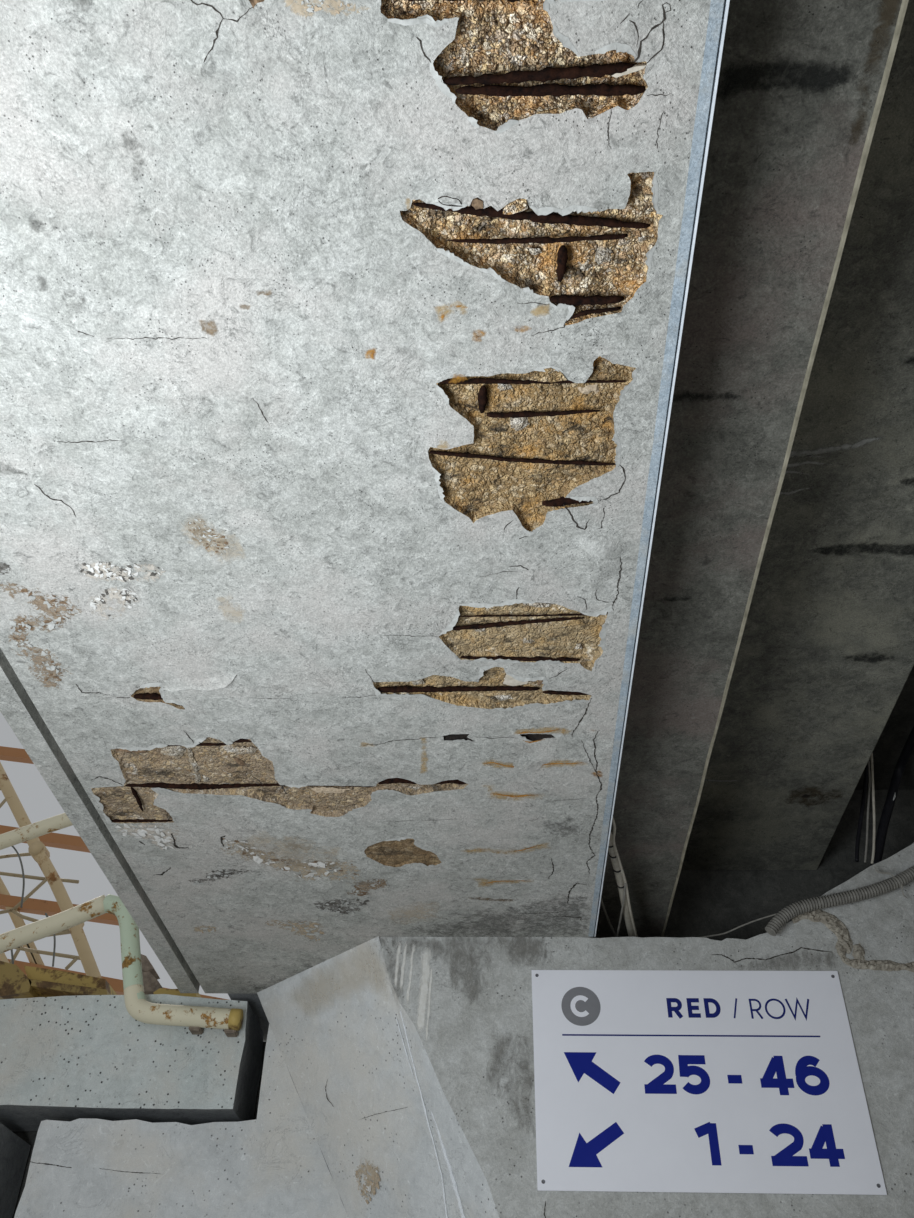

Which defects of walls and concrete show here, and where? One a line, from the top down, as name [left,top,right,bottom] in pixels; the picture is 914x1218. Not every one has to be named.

crack [191,0,253,63]
spalling [285,0,648,134]
crack [620,0,671,65]
spalling [400,172,663,326]
spalling [428,356,637,535]
spalling [372,598,613,711]
spalling [91,737,469,850]
spalling [188,836,442,941]
crack [715,947,830,963]